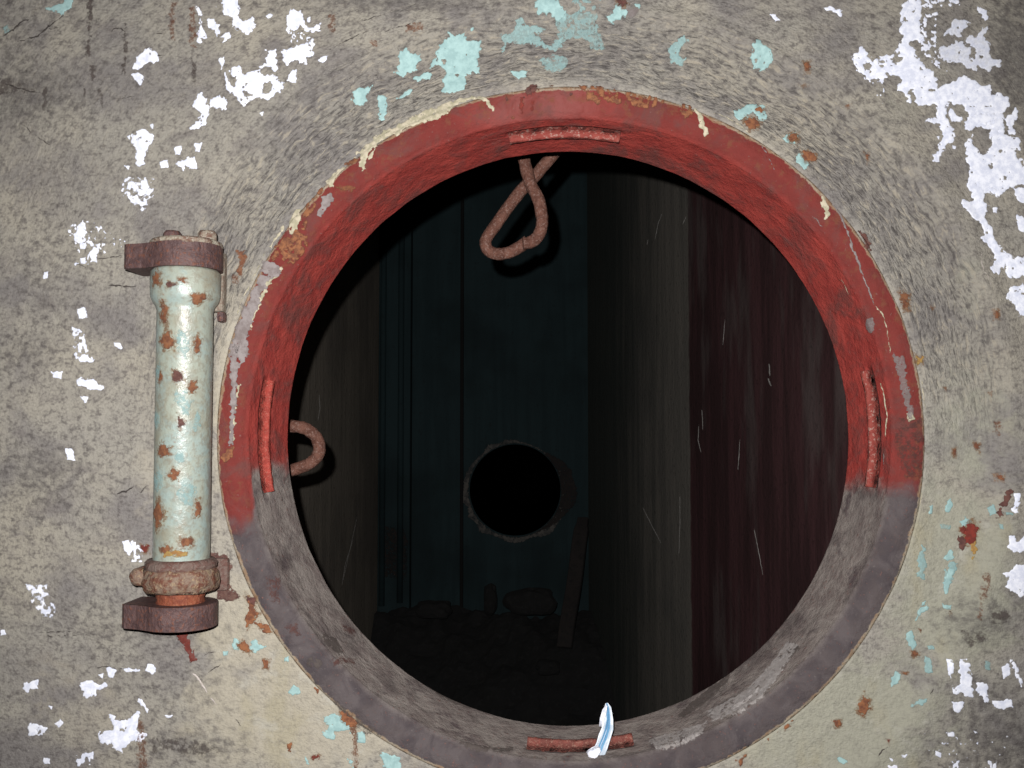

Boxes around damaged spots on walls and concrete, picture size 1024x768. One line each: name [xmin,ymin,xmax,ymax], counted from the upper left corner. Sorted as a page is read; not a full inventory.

peeling [195,0,273,43]
peeling [189,8,327,130]
peeling [350,32,494,171]
peeling [852,0,1024,316]
rust [152,272,185,352]
rust [190,292,206,307]
rust [158,368,198,393]
rust [140,536,194,558]
rust [957,518,979,560]
rust [215,585,272,653]
peeling [946,659,1013,713]
peeling [76,698,149,766]